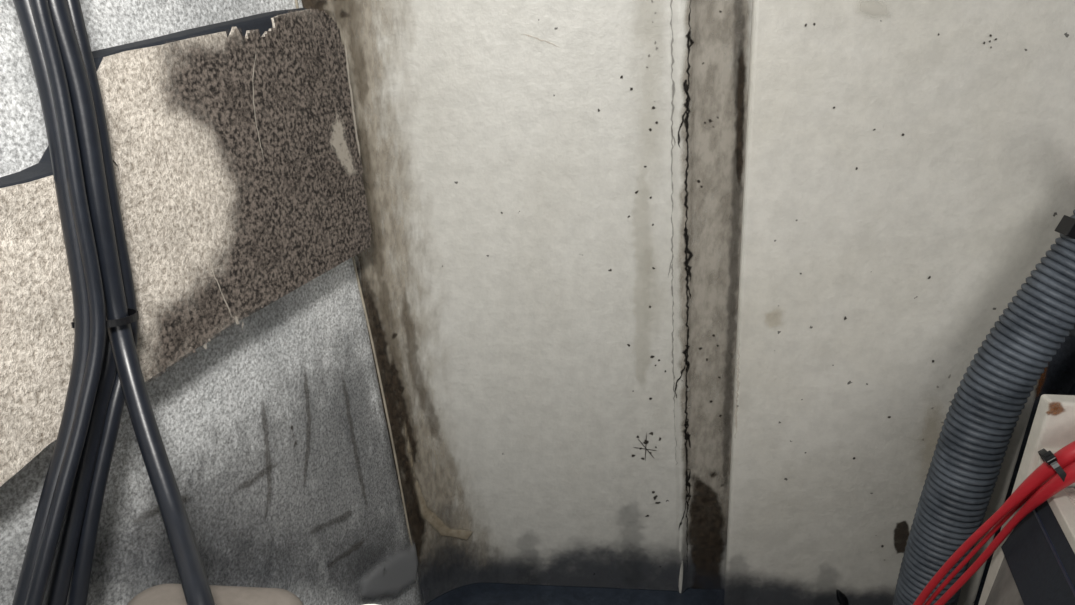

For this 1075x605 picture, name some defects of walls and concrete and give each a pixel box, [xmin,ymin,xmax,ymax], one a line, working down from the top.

water stain [152,0,894,605]
crack [675,1,694,567]